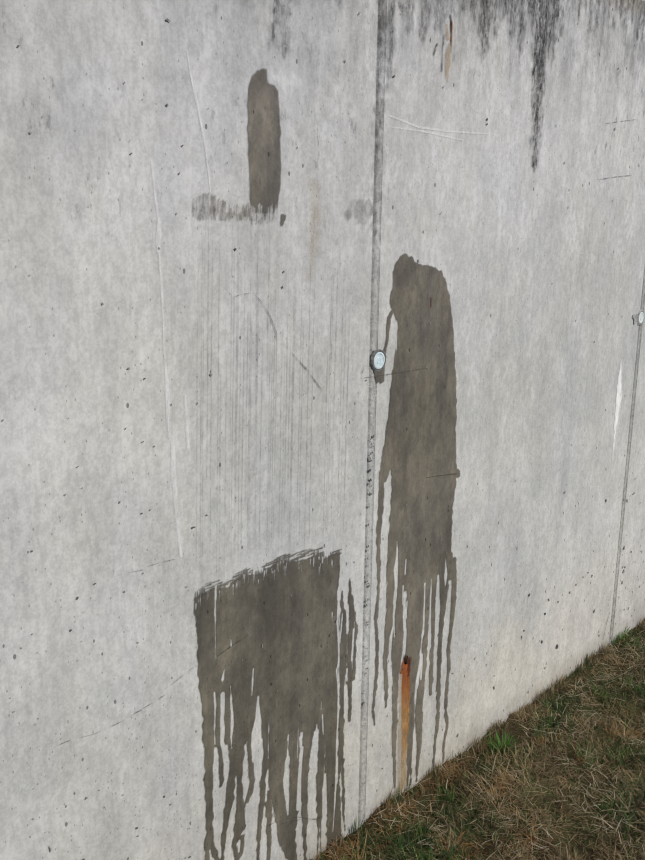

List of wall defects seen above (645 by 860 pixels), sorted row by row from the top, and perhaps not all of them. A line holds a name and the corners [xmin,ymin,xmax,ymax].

water stain [211,69,296,226]
water stain [471,0,563,169]
water stain [372,254,460,788]
water stain [194,547,358,860]
rust [398,656,411,791]